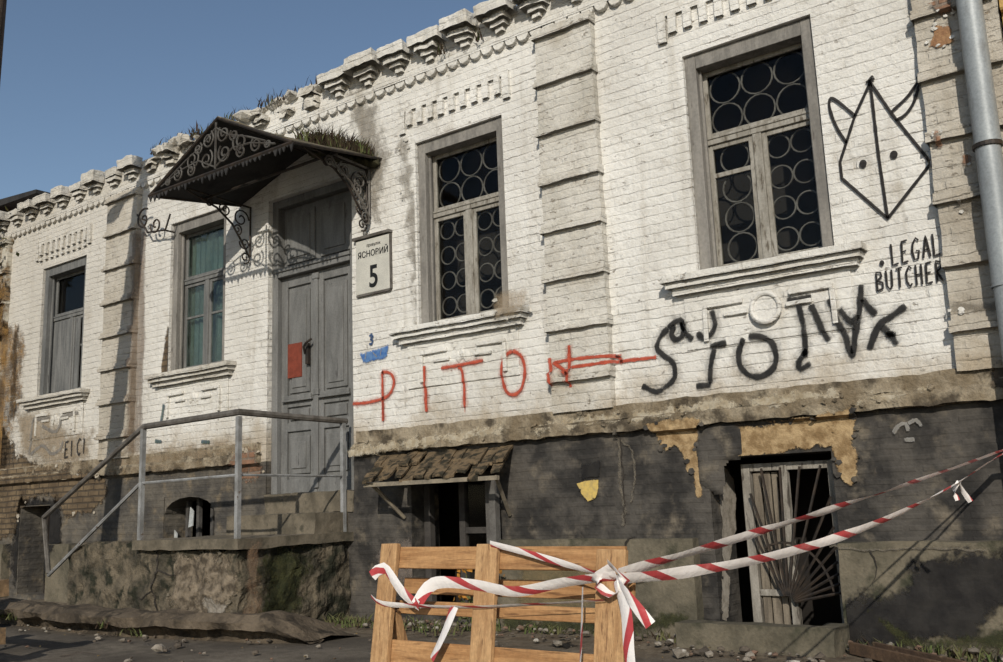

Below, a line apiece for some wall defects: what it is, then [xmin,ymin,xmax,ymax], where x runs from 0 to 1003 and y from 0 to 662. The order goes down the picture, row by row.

spalling [925,0,956,48]
peeling [0,427,108,541]
flaking render [531,385,935,501]
flaking render [719,467,736,621]
leakage [845,546,1003,648]